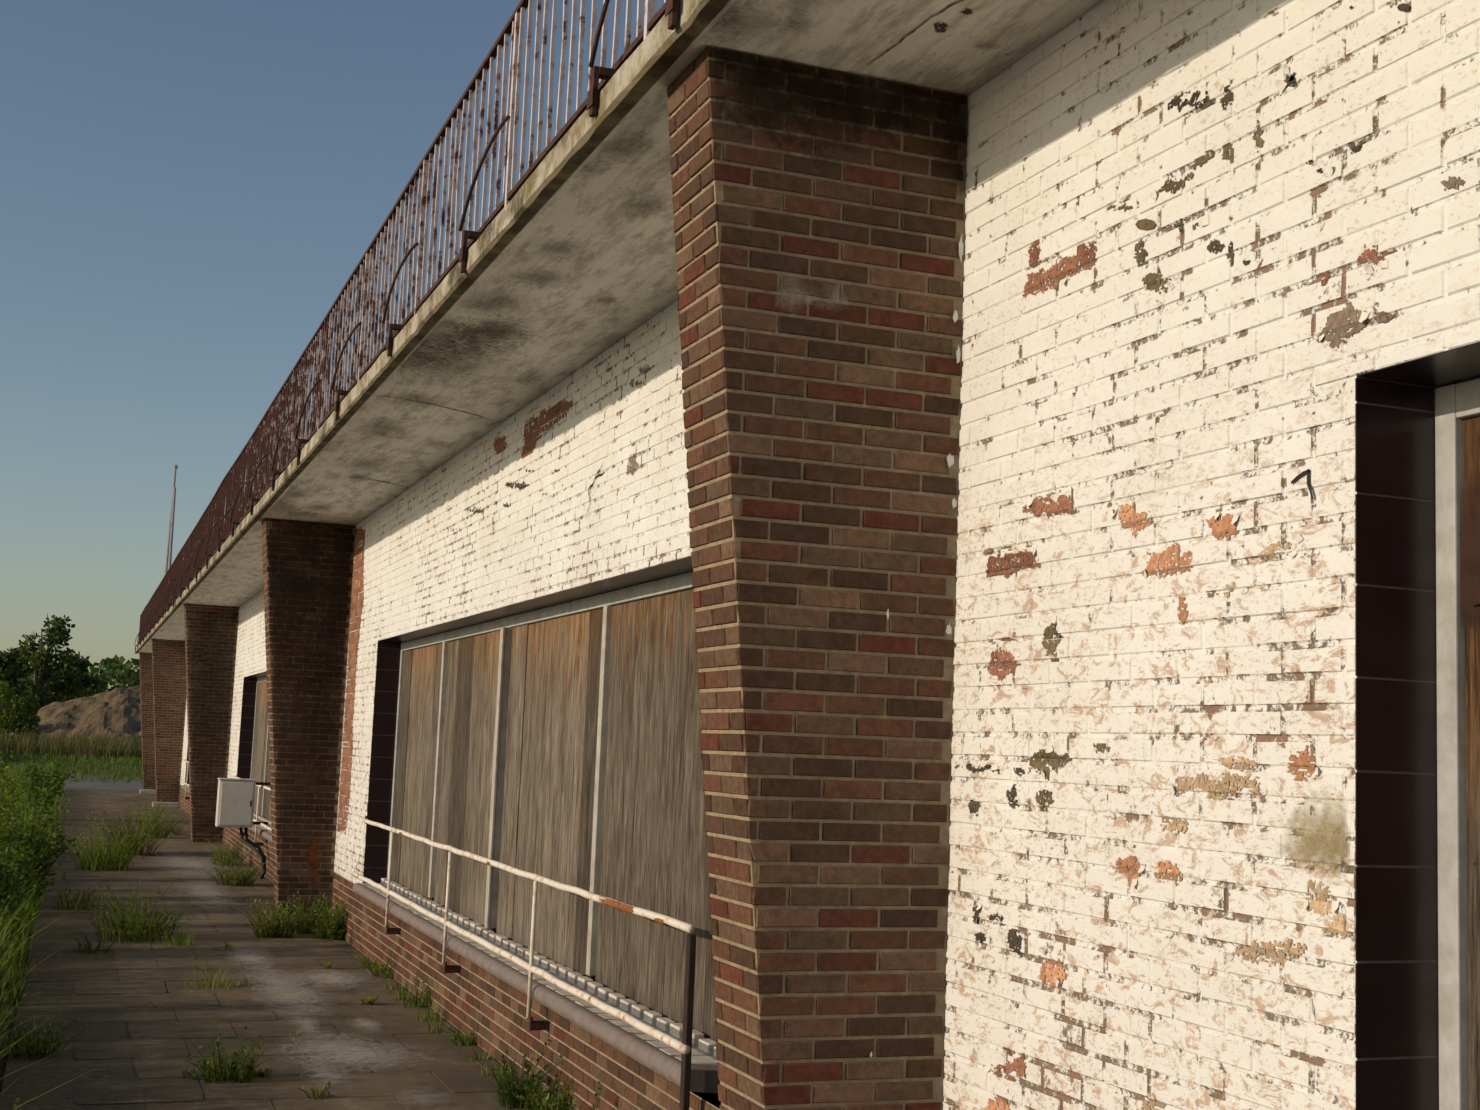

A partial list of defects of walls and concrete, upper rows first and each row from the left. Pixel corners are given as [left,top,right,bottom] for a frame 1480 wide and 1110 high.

peeling [1168,78,1233,113]
peeling [1107,142,1234,306]
peeling [1174,214,1250,266]
peeling [1022,240,1097,300]
peeling [1316,302,1394,348]
peeling [466,400,573,514]
peeling [985,545,1040,578]
peeling [1109,497,1192,579]
peeling [1041,615,1063,662]
peeling [955,744,1072,812]
corrosion [599,896,670,926]
peeling [972,903,1022,957]